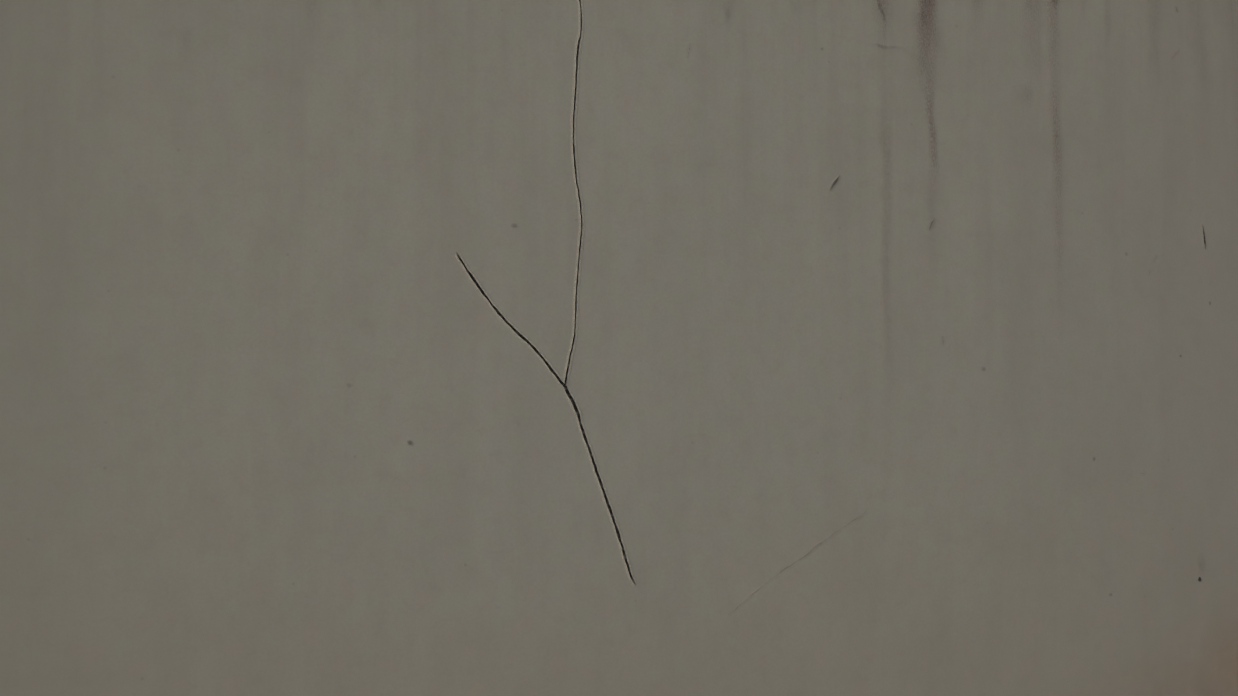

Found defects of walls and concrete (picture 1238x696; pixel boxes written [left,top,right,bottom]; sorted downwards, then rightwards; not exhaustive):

crack [457,0,634,582]